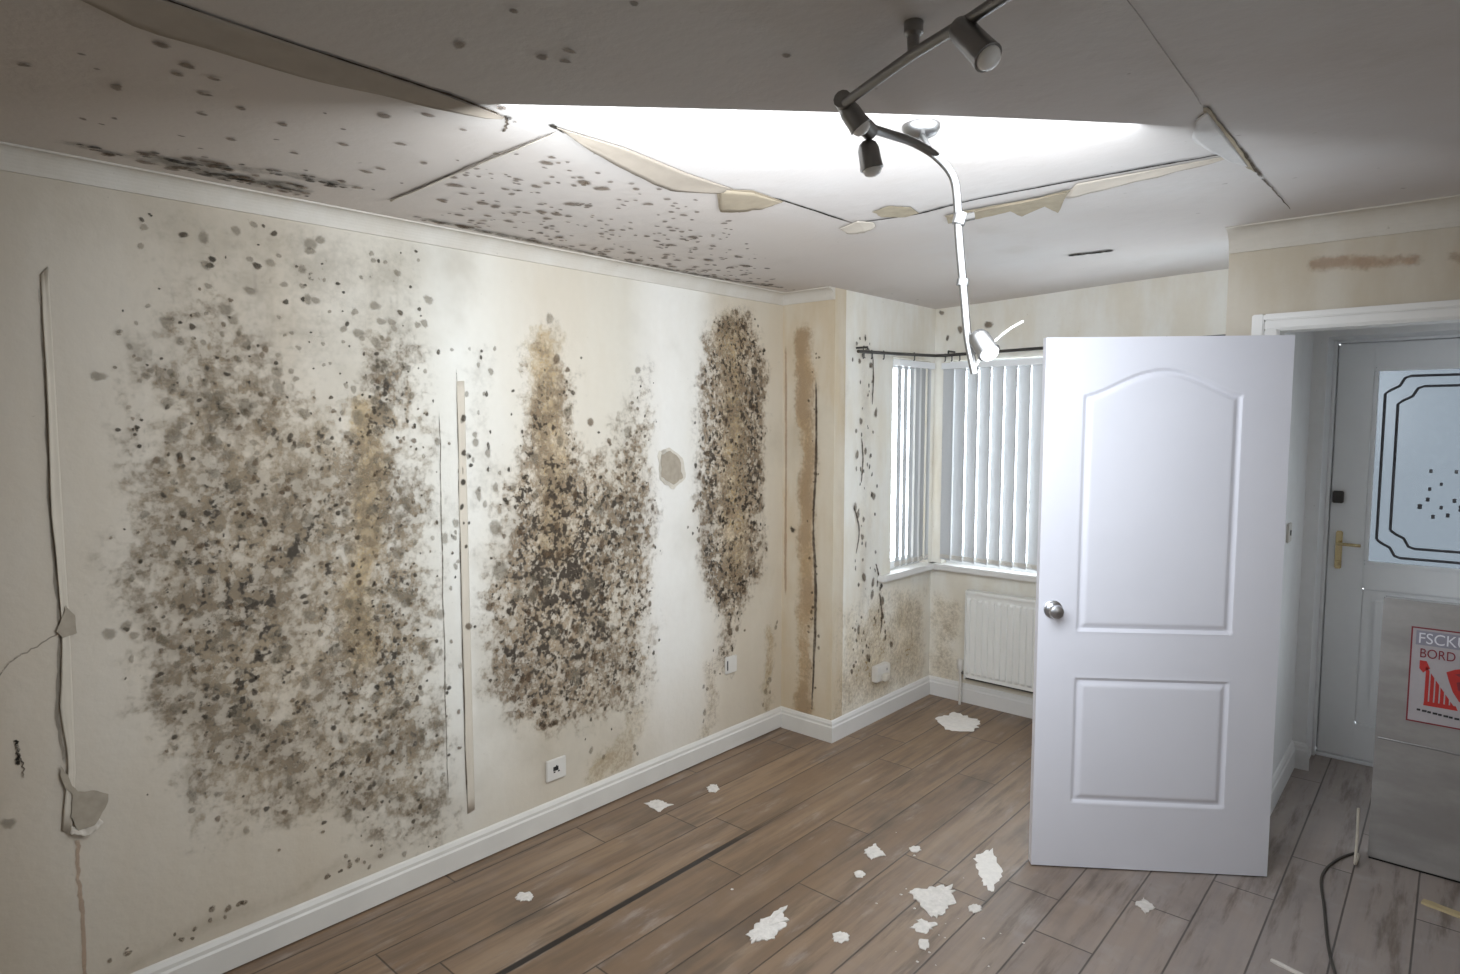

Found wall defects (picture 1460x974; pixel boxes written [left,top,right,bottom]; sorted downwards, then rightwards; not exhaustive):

damp [414,156,787,290]
damp [109,298,470,879]
damp [466,349,661,730]
damp [687,310,769,674]
damp [851,335,893,673]
crack [14,740,25,777]
damp [174,901,247,941]